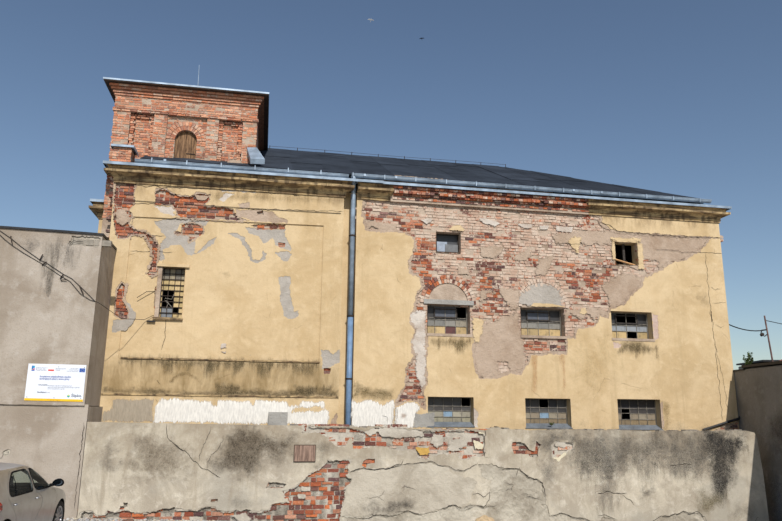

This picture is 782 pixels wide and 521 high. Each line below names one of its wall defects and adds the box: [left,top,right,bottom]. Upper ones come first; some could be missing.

spalling [382,175,555,194]
spalling [69,176,292,278]
crack [602,222,728,407]
spalling [80,195,723,521]
damp [207,386,333,396]
spalling [715,420,738,431]
crack [166,426,222,478]
damp [220,431,287,472]
crack [351,432,487,472]
crack [446,468,545,510]
damp [572,433,742,509]